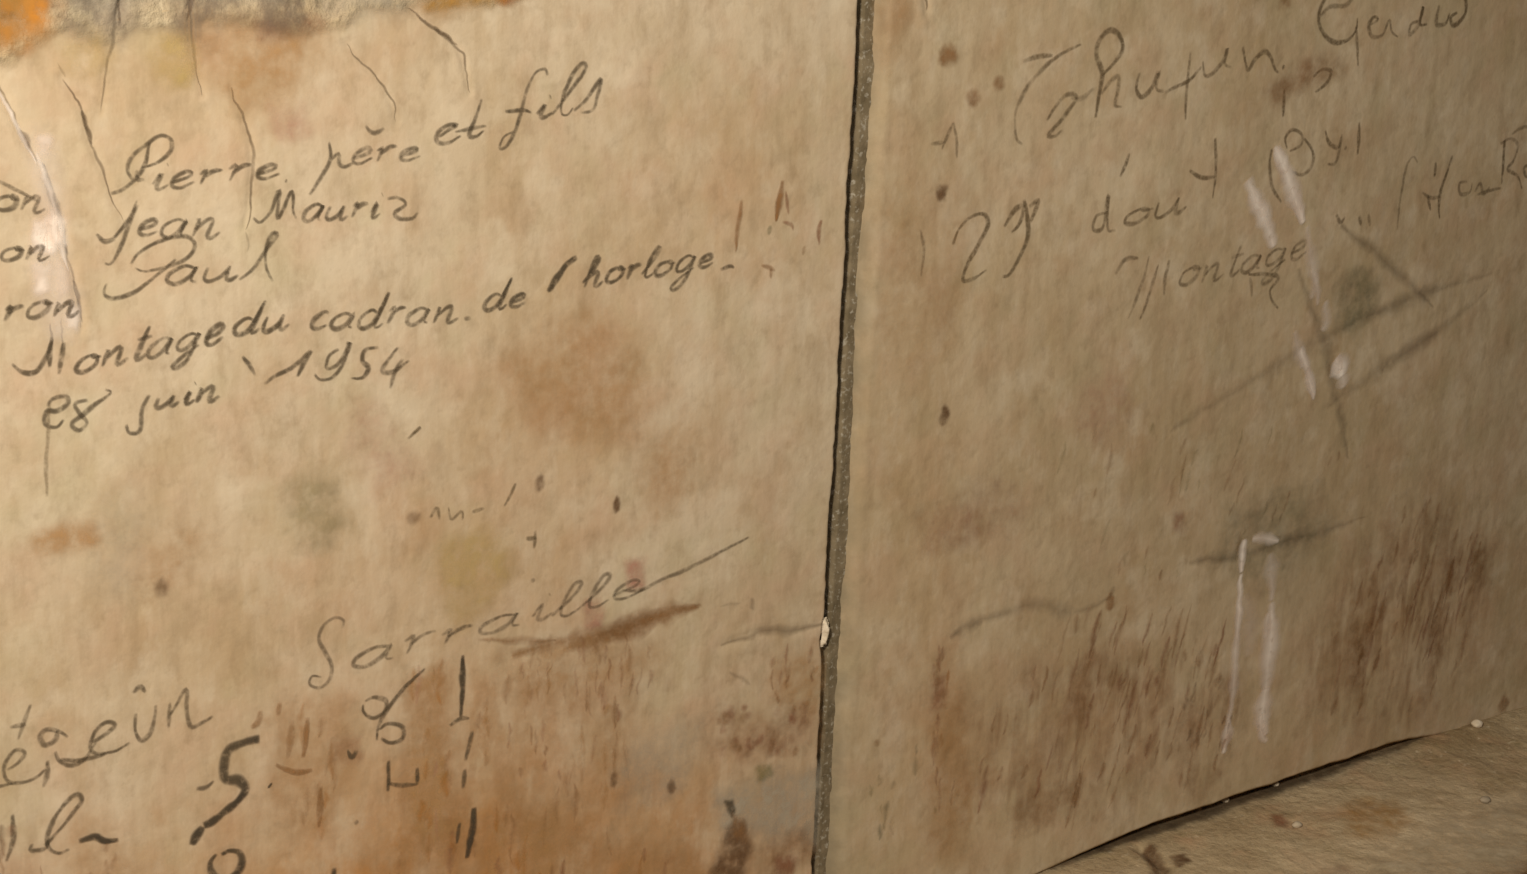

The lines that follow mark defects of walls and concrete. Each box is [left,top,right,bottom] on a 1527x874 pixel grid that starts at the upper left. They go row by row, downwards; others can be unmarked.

rust [0,0,49,42]
spalling [0,0,448,62]
peeling [0,94,69,292]
peeling [69,307,78,327]